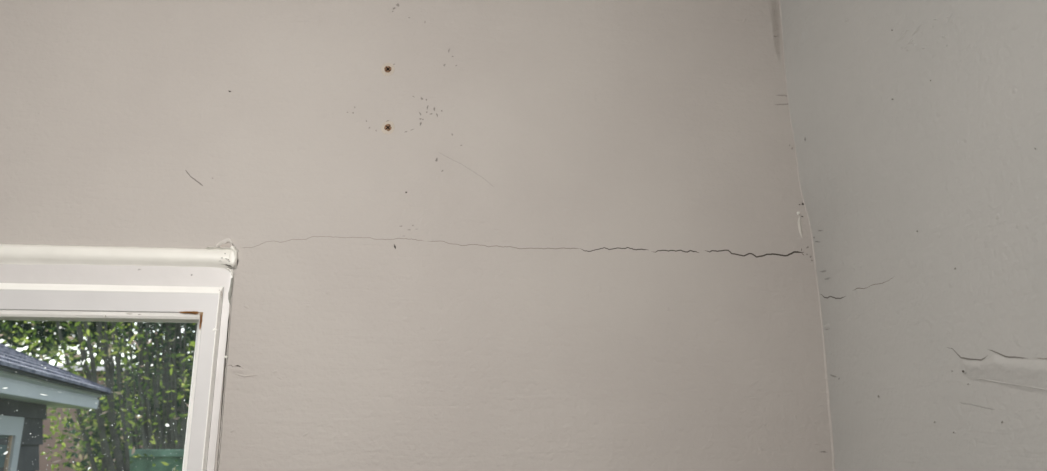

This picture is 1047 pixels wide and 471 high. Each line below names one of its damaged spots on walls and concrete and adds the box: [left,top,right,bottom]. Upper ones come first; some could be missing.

crack [241,235,804,259]
crack [947,347,1047,361]
crack [217,286,233,471]